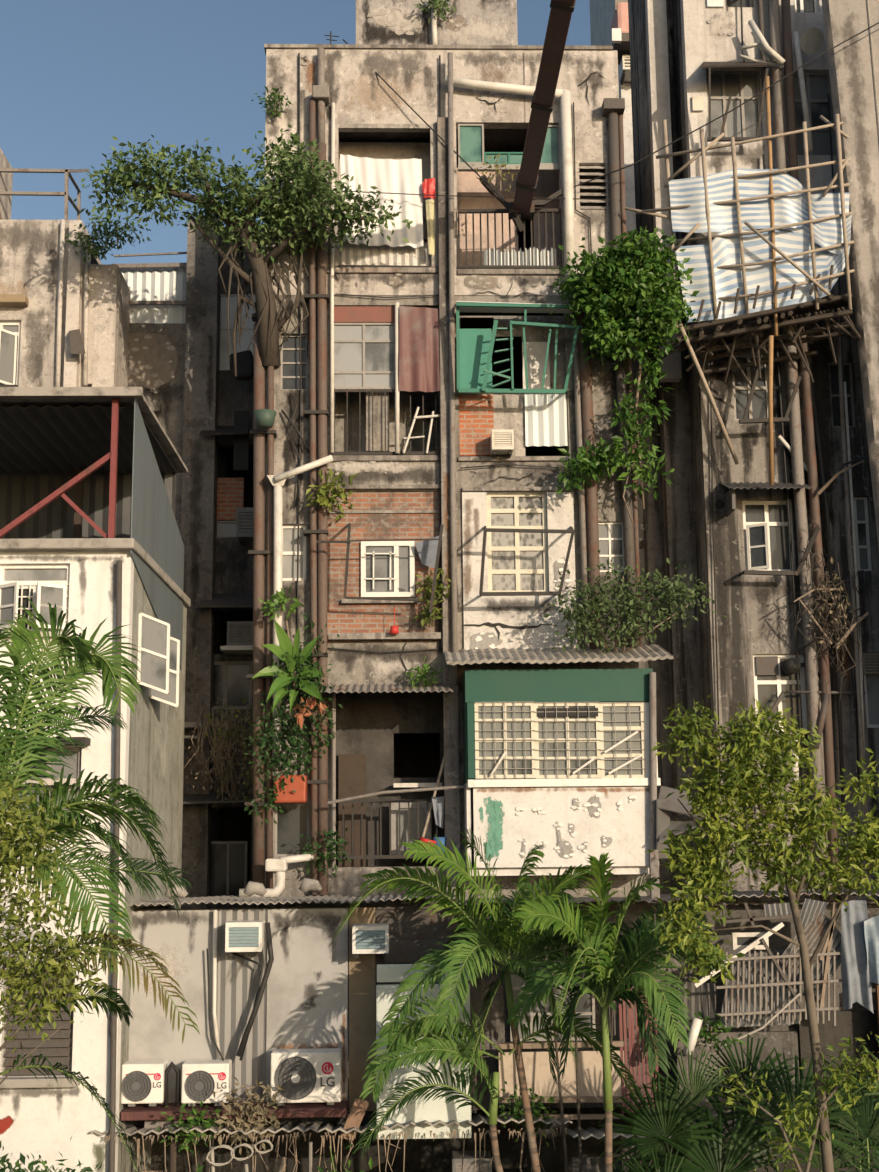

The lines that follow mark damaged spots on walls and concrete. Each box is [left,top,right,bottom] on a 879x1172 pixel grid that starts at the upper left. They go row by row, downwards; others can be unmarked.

damp [325,51,341,118]
damp [830,18,879,362]
spalling [128,327,194,394]
damp [742,423,759,472]
damp [779,426,791,462]
damp [804,340,839,561]
damp [2,555,122,601]
peeling [470,632,502,649]
crack [464,622,552,640]
peeling [479,797,505,860]
peeling [518,794,602,859]
damp [144,950,183,994]